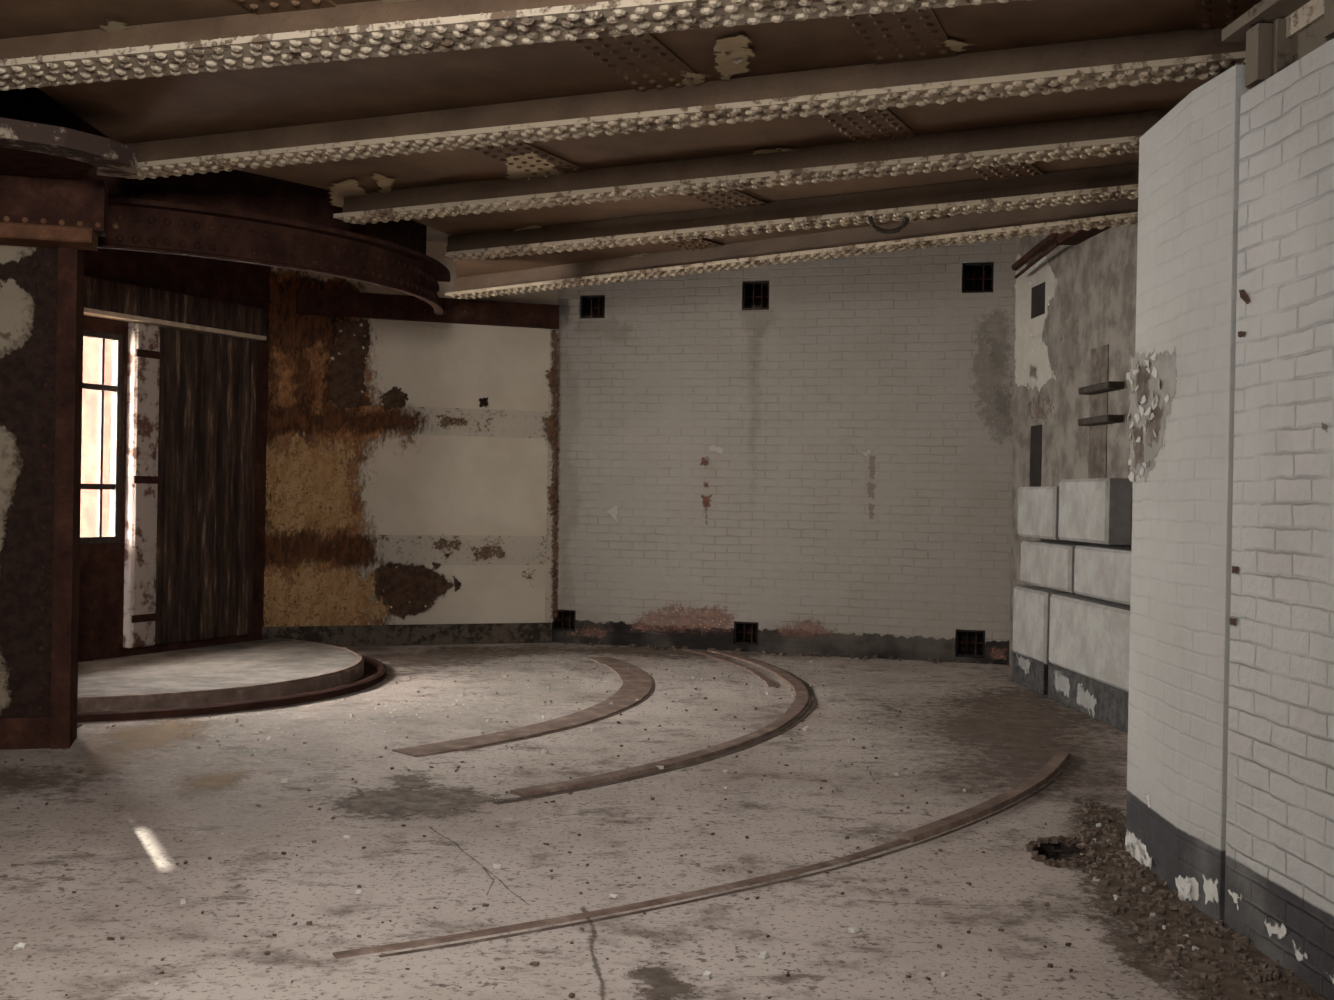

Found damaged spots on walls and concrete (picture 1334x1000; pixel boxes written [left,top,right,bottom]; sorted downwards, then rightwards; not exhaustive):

peeling [100,21,130,32]
peeling [680,35,755,86]
peeling [942,40,971,52]
peeling [328,318,408,410]
peeling [1126,348,1177,482]
peeling [370,551,461,620]
spalling [1125,830,1152,870]
spalling [1175,875,1242,910]
crack [582,908,604,1000]
spalling [1264,920,1308,961]